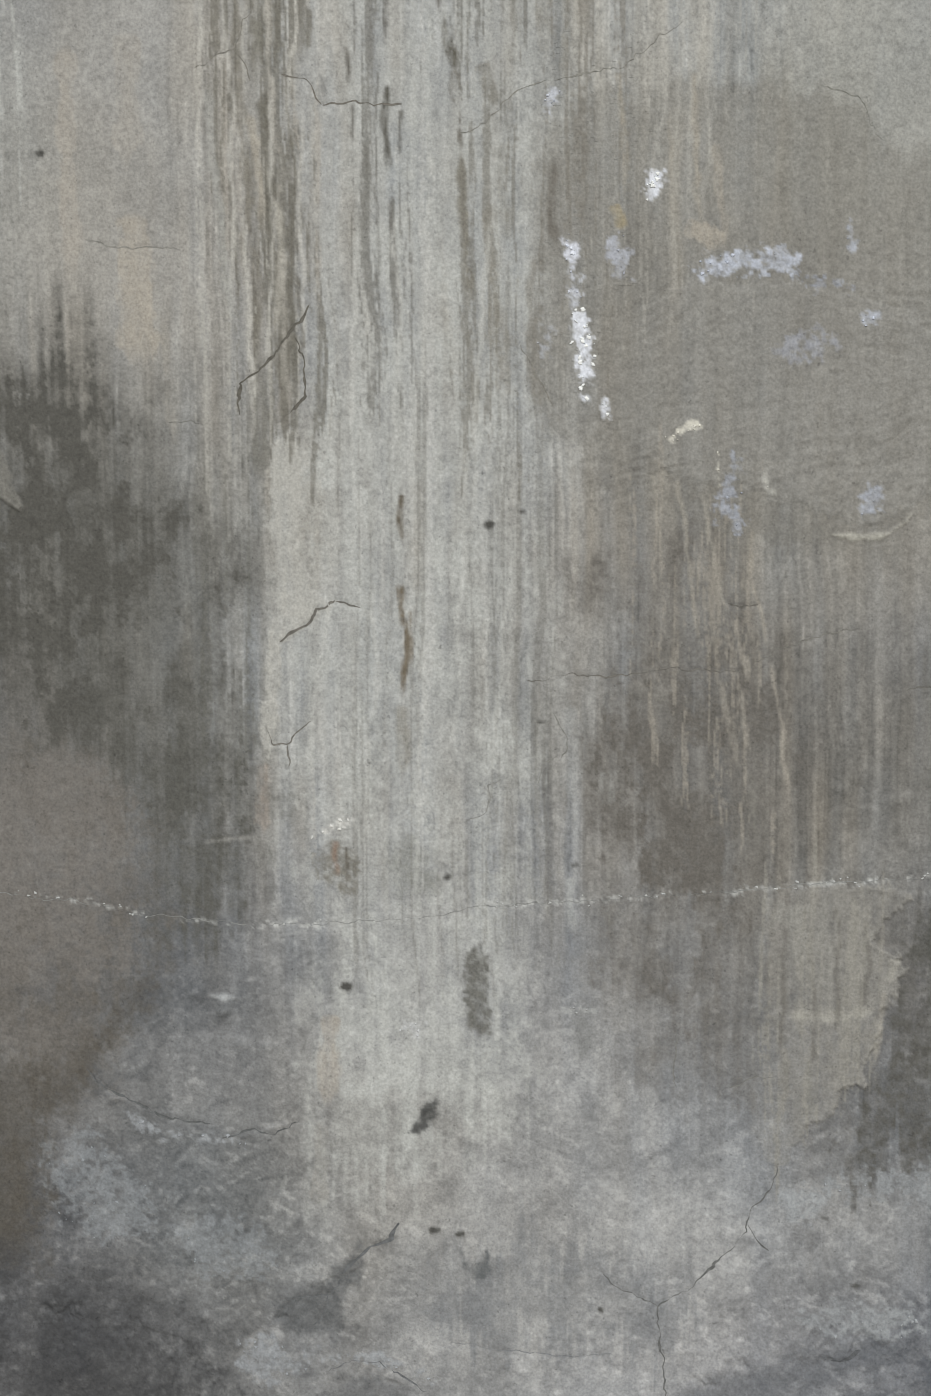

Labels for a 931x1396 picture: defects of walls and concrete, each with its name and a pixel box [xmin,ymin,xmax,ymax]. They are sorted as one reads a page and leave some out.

damp [190,0,241,325]
damp [239,0,279,375]
crack [237,305,309,422]
damp [271,0,309,353]
damp [279,310,310,423]
damp [477,140,516,421]
damp [518,0,526,72]
damp [545,242,572,334]
damp [627,0,732,301]
damp [702,0,931,328]
crack [603,1167,778,1396]
crack [831,1350,861,1362]